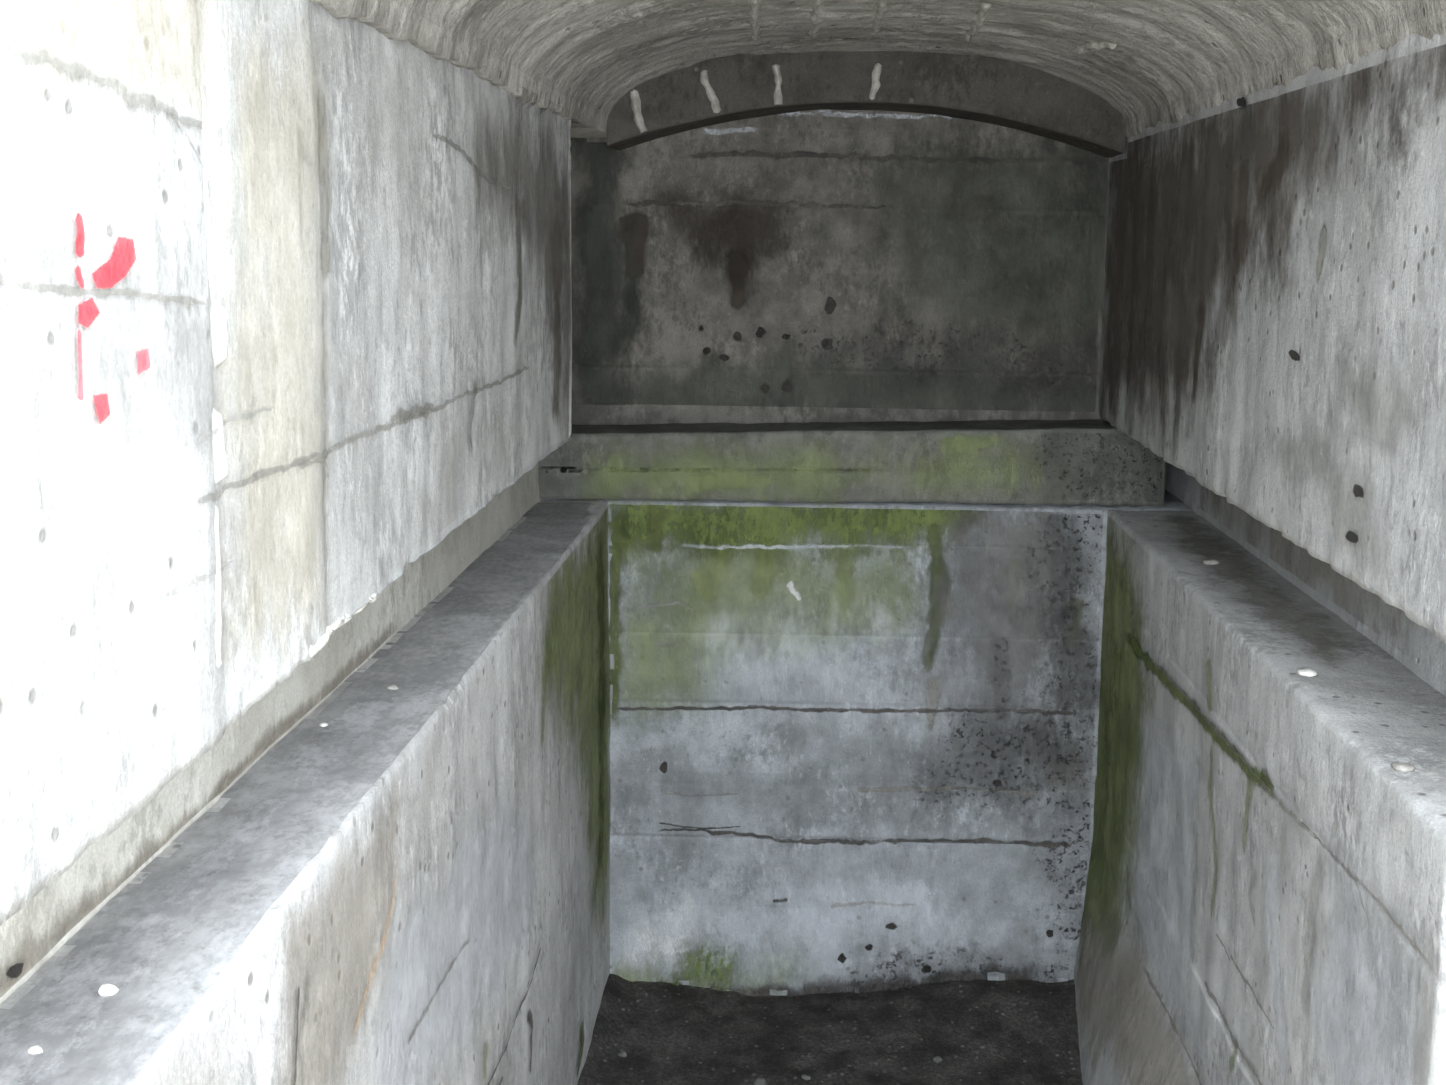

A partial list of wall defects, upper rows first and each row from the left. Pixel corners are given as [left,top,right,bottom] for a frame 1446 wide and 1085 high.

damp [1429,44,1446,98]
damp [486,67,1383,425]
crack [202,366,528,503]
damp [648,506,669,552]
damp [597,516,629,866]
crack [616,705,1073,715]
damp [917,433,1162,953]
crack [858,786,1035,797]
damp [1260,770,1274,792]
crack [660,792,1070,848]